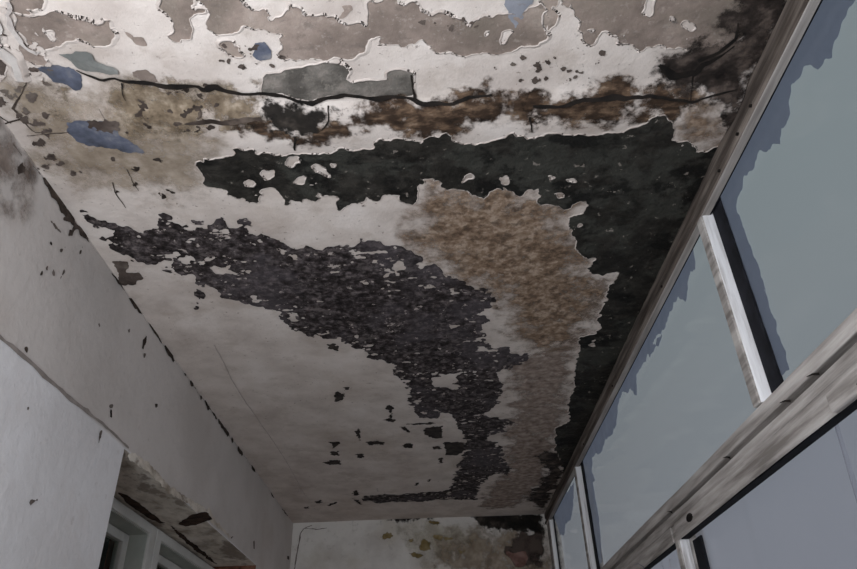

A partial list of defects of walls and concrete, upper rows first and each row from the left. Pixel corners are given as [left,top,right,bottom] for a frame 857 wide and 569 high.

peeling [0,0,147,176]
peeling [135,99,152,129]
peeling [132,70,158,83]
water stain [0,82,327,191]
peeling [166,83,219,133]
crack [76,70,492,131]
peeling [155,0,743,101]
crack [529,23,739,132]
water stain [80,0,787,510]
spalling [126,453,233,539]
water stain [411,539,430,558]
water stain [433,514,552,569]